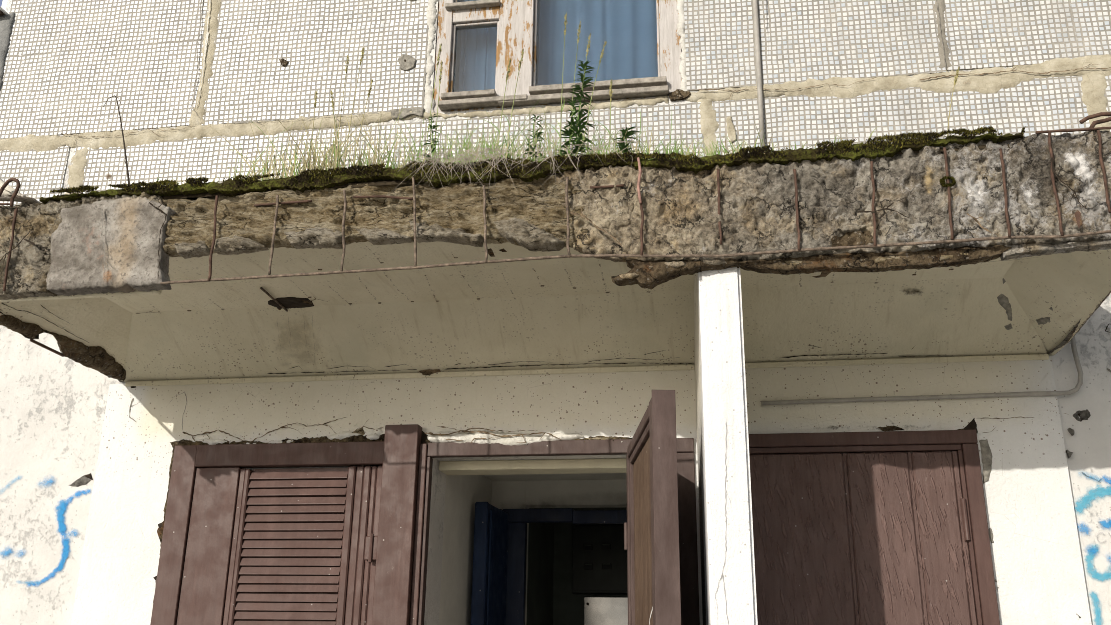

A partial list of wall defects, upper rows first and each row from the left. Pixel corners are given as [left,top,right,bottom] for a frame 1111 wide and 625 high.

spalling [726,116,736,143]
spalling [0,130,1111,300]
spalling [260,287,314,312]
peeling [997,278,1012,330]
spalling [0,315,136,388]
crack [170,391,383,441]
crack [425,426,561,444]
flaking render [1067,409,1091,436]